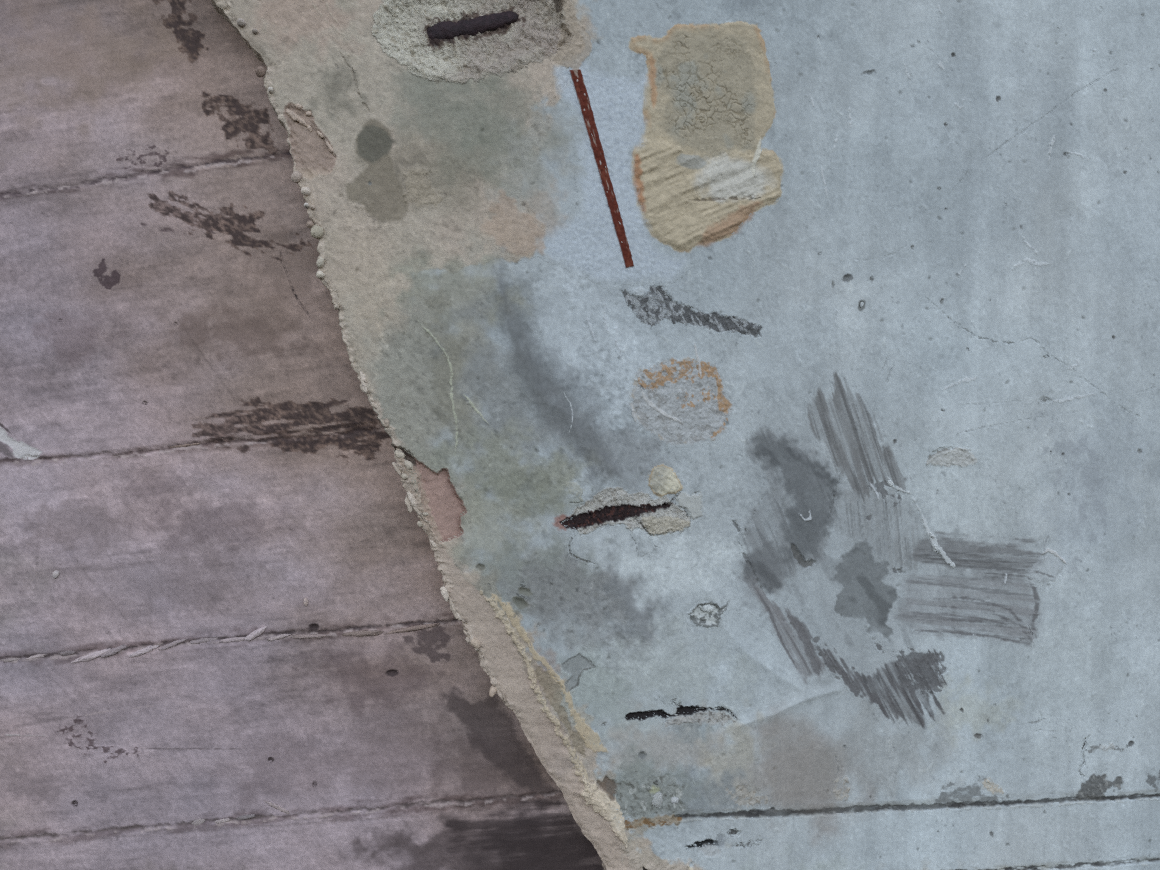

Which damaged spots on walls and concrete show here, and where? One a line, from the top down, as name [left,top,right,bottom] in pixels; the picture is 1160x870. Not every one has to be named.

spalling [370,0,636,270]
spalling [620,283,764,340]
rust [625,340,737,449]
peeling [255,60,706,870]
spalling [686,598,732,630]
leakage [755,588,824,678]
leakage [912,577,1043,649]